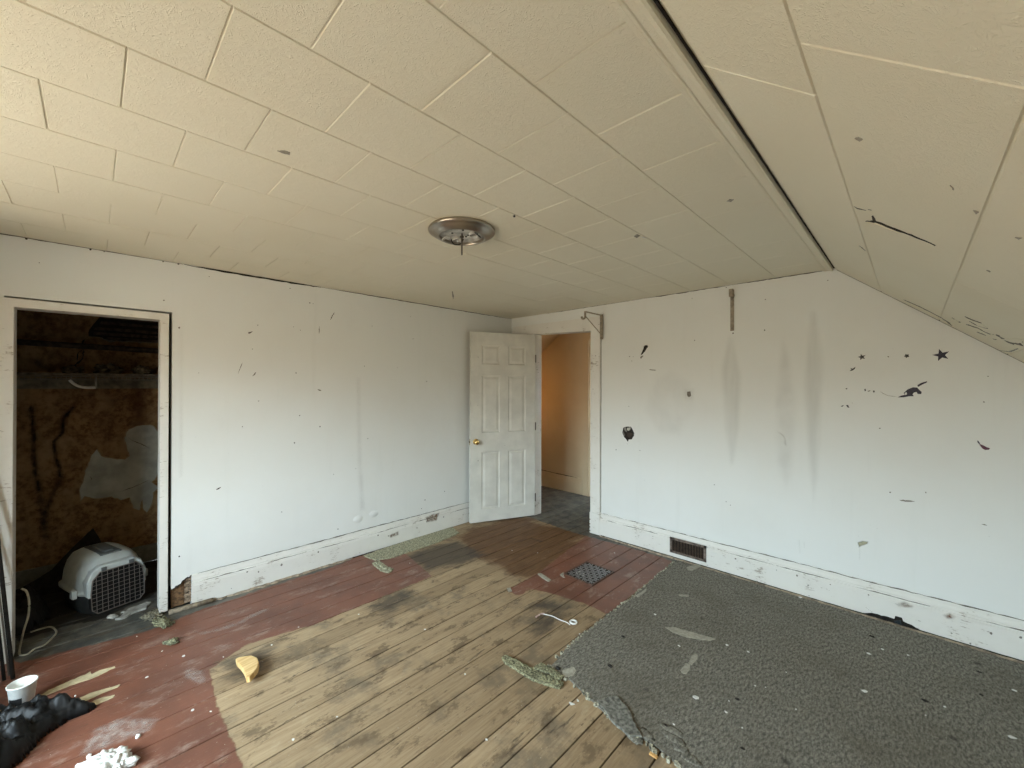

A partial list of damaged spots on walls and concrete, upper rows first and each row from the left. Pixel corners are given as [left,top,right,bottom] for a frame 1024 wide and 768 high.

crack [547,0,1024,363]
peeling [905,300,1023,352]
peeling [79,424,158,513]
spalling [170,575,191,608]